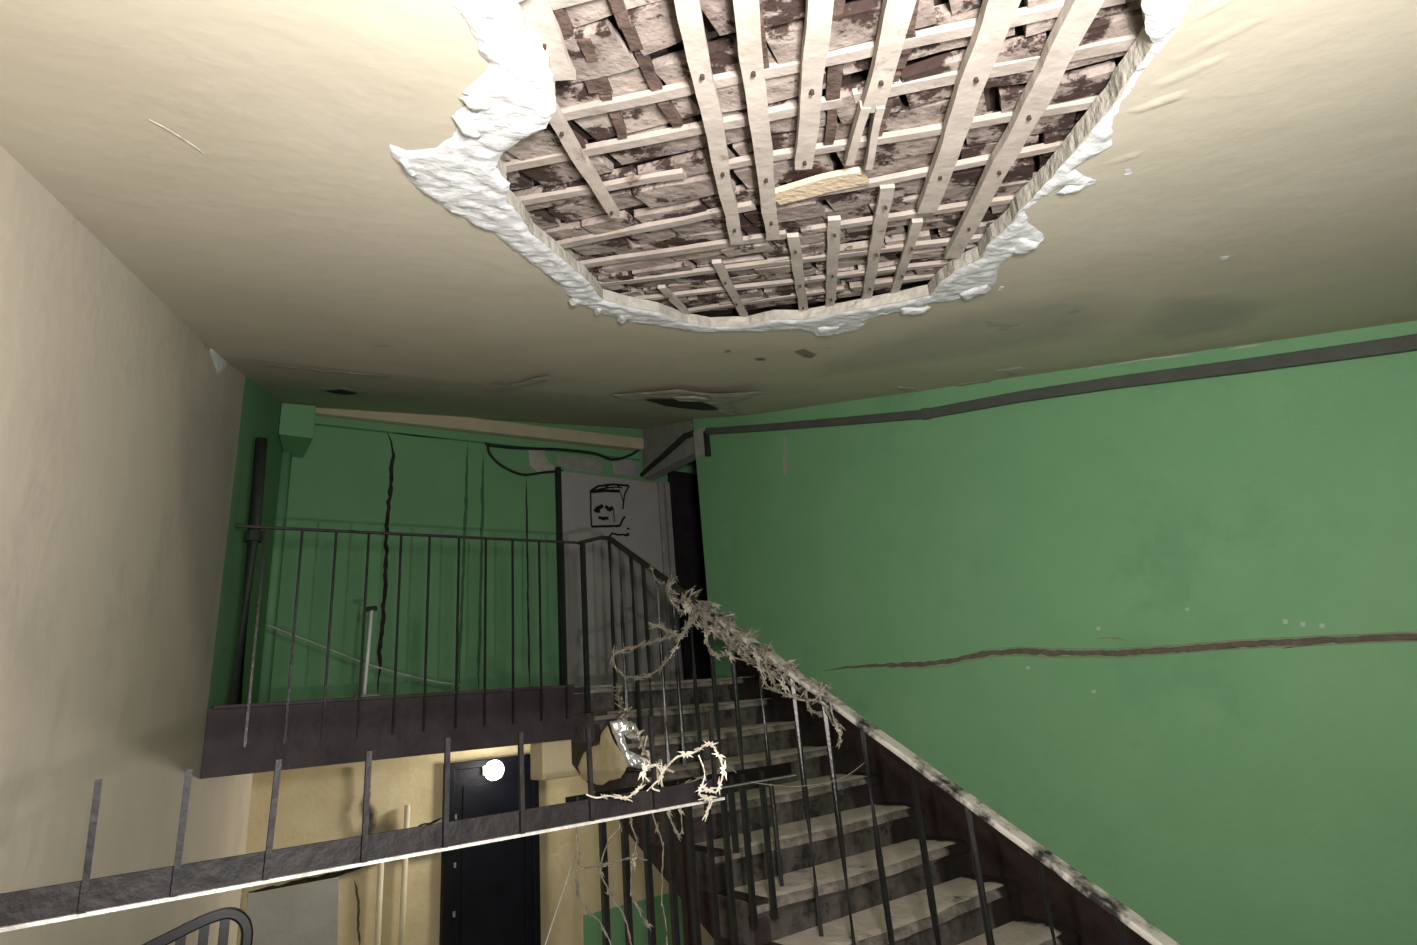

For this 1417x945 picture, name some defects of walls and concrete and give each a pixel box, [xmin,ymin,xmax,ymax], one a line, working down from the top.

flaking render [389,0,1192,336]
crack [377,433,395,694]
crack [825,631,1417,671]
crack [248,866,363,945]